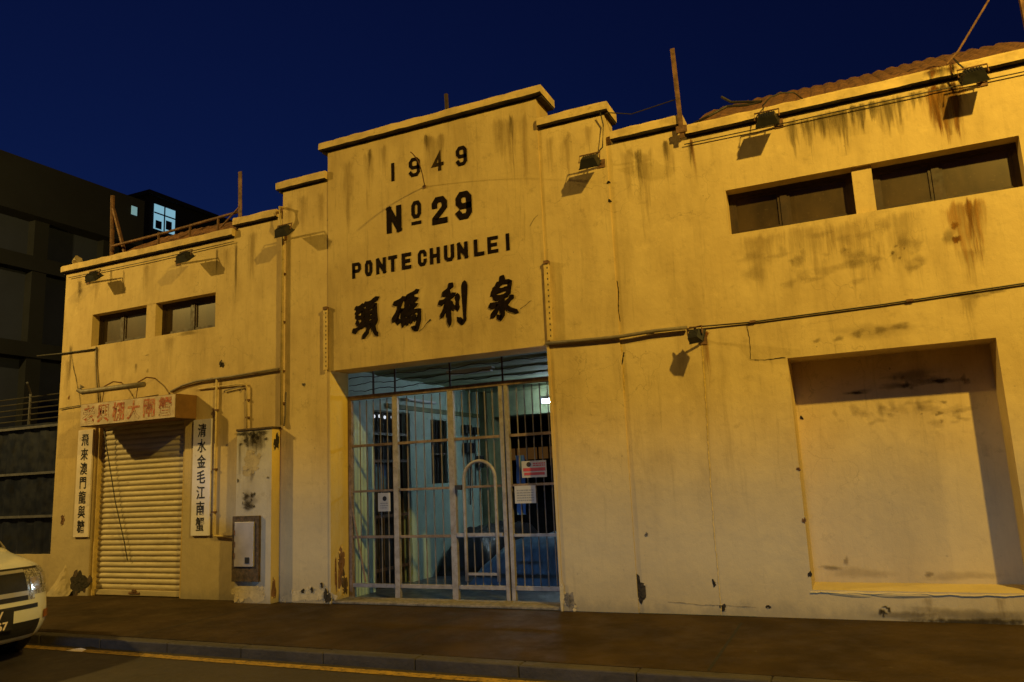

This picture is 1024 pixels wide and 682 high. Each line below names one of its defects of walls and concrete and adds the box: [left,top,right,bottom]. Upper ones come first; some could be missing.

rust [949,199,980,243]
spalling [70,570,92,596]
spalling [637,574,646,604]